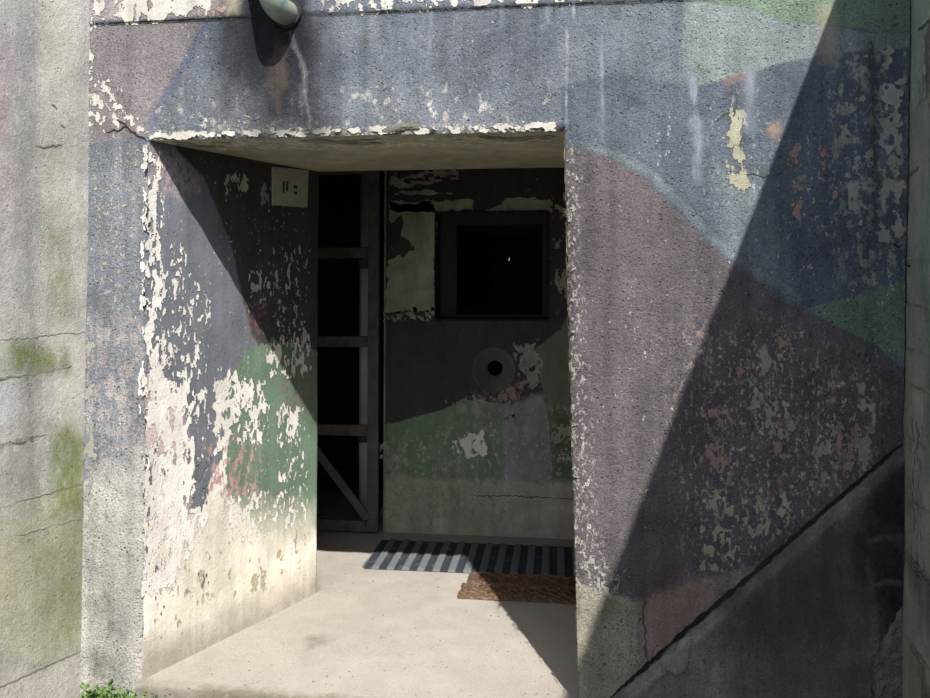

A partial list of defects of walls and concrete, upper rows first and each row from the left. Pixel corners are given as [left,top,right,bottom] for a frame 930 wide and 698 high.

peeling [90,0,230,32]
peeling [321,0,504,15]
peeling [515,0,538,9]
crack [107,120,146,140]
peeling [486,147,577,222]
peeling [725,106,756,191]
peeling [817,44,907,245]
peeling [549,238,580,333]
peeling [87,48,557,623]
peeling [746,328,878,487]
peeling [548,405,596,529]
peeling [699,485,794,572]